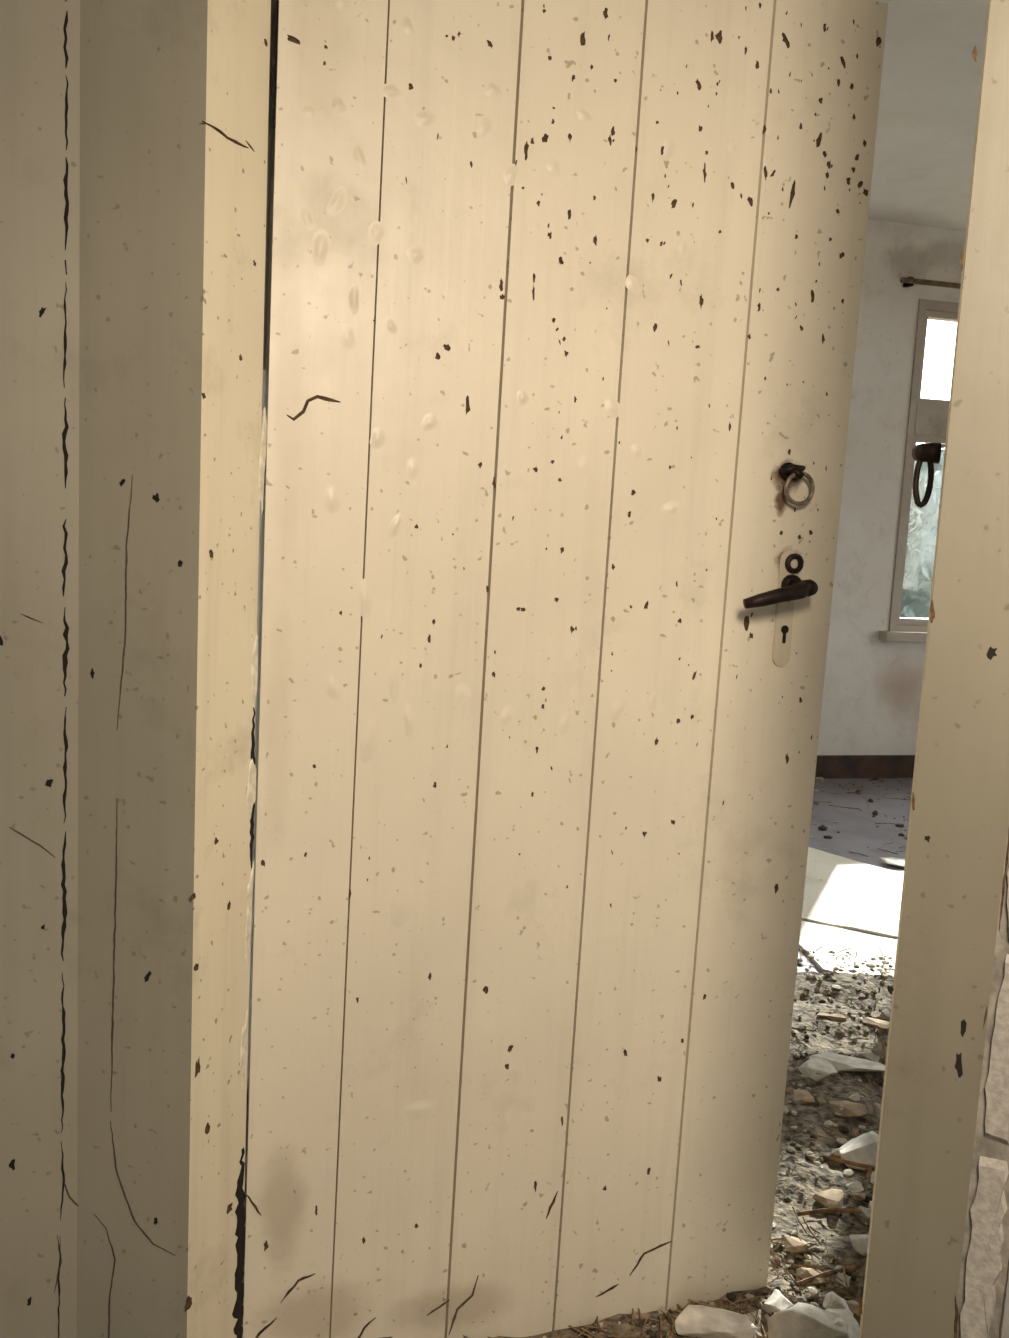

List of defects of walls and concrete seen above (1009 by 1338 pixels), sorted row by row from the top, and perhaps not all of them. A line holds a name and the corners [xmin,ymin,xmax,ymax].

crack [202,0,278,152]
crack [10,0,175,1338]
crack [249,708,257,764]
crack [248,802,256,868]
crack [232,1148,246,1338]